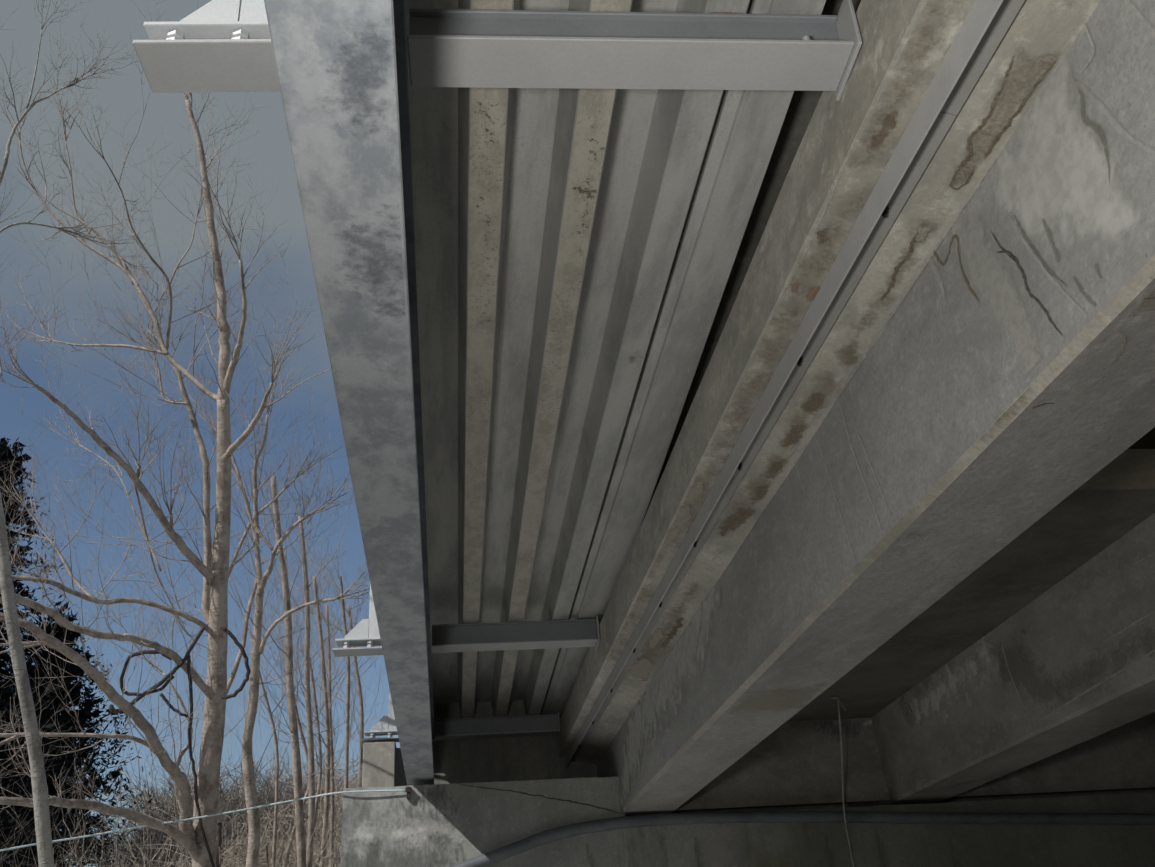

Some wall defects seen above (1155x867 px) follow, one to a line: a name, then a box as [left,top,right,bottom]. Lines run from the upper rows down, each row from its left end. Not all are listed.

crack [992,233,1061,335]
water stain [620,587,719,805]